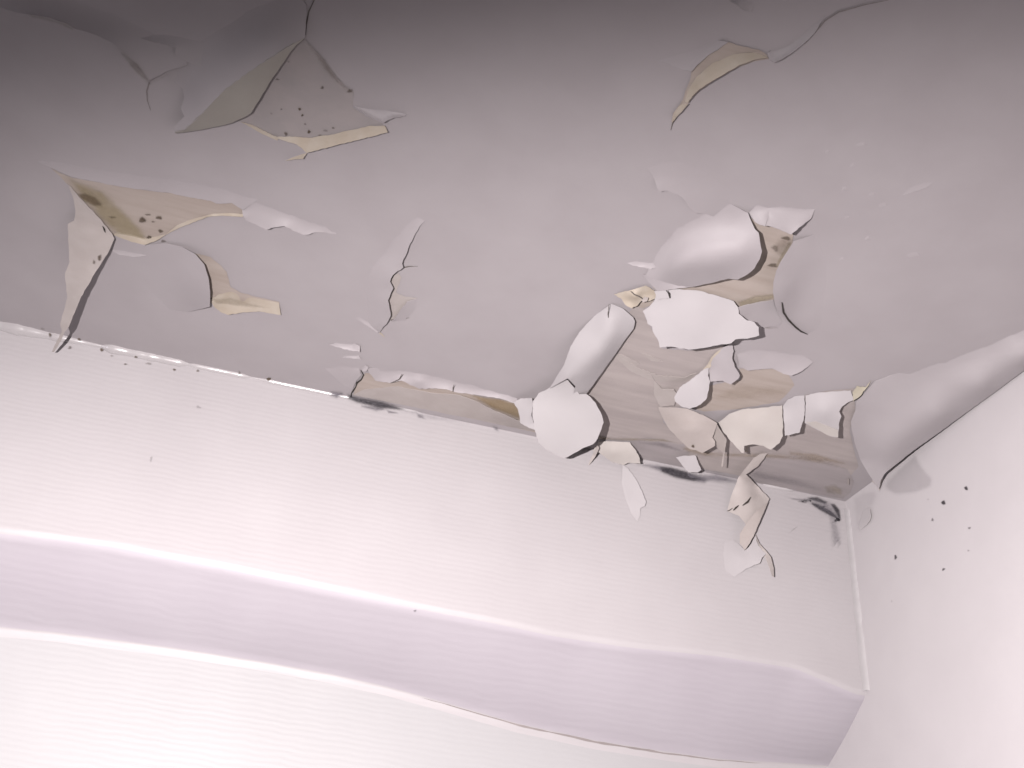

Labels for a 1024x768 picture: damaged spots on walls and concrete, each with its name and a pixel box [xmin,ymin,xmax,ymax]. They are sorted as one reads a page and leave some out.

peeling [0,0,407,161]
peeling [658,0,887,129]
peeling [38,161,336,352]
crack [356,218,425,337]
peeling [325,204,871,577]
water stain [802,498,840,521]